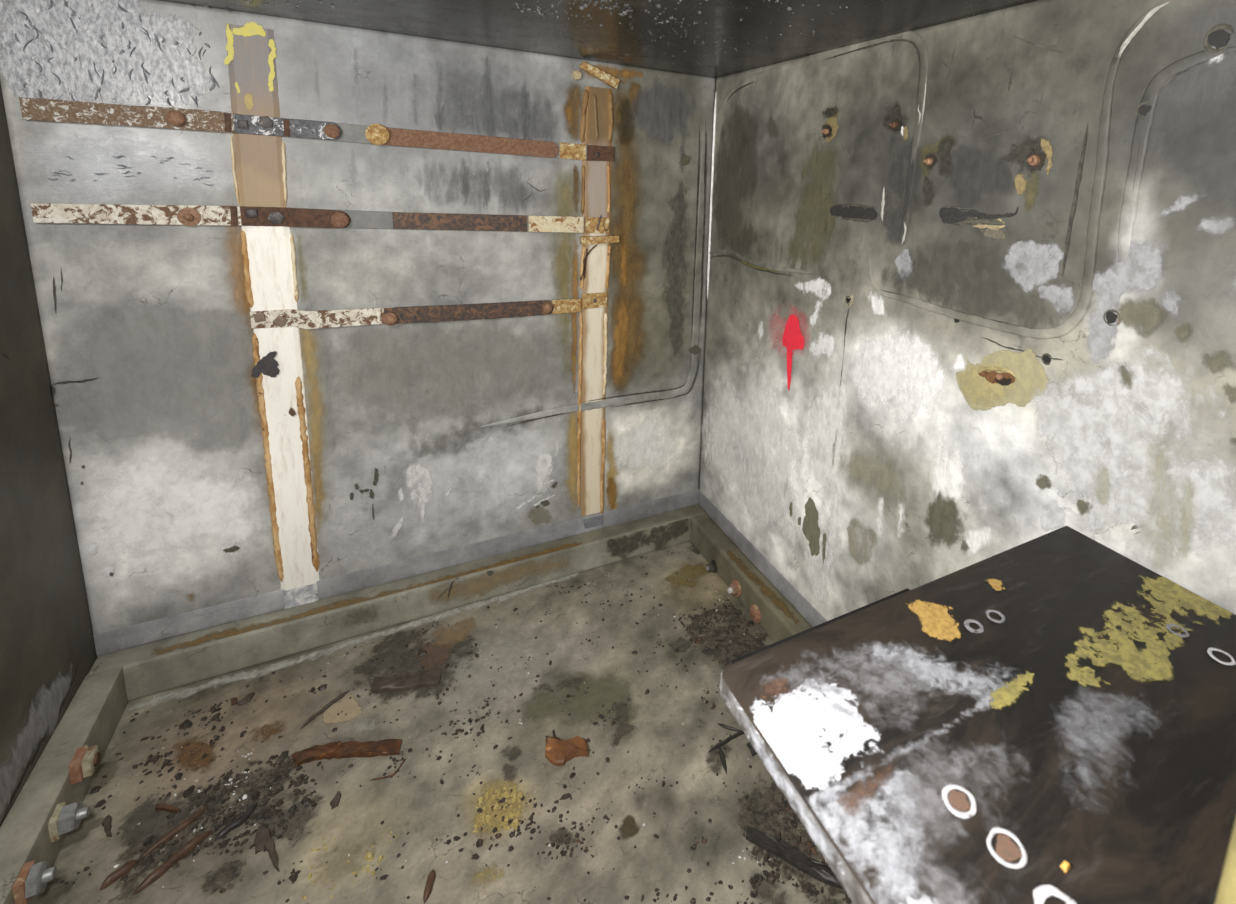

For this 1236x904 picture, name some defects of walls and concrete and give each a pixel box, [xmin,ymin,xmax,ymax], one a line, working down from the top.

rust [565,86,581,139]
rust [229,207,253,338]
rust [555,233,578,382]
rust [558,166,578,216]
rust [586,66,643,390]
rust [303,329,323,507]